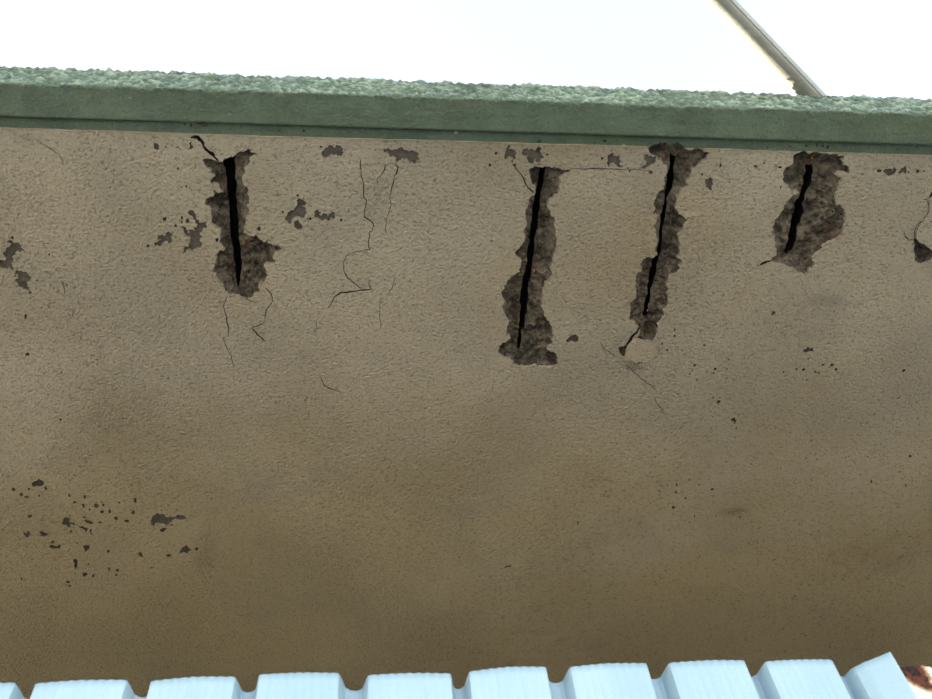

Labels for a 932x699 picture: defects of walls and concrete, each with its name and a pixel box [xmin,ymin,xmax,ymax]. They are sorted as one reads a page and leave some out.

peeling [0,236,38,294]
crack [190,135,219,162]
spalling [146,148,282,300]
crack [222,287,273,368]
crack [313,160,399,332]
spalling [489,140,570,368]
spalling [594,140,718,351]
spalling [770,143,850,276]
peeling [877,166,925,176]
corrosion [899,665,932,692]